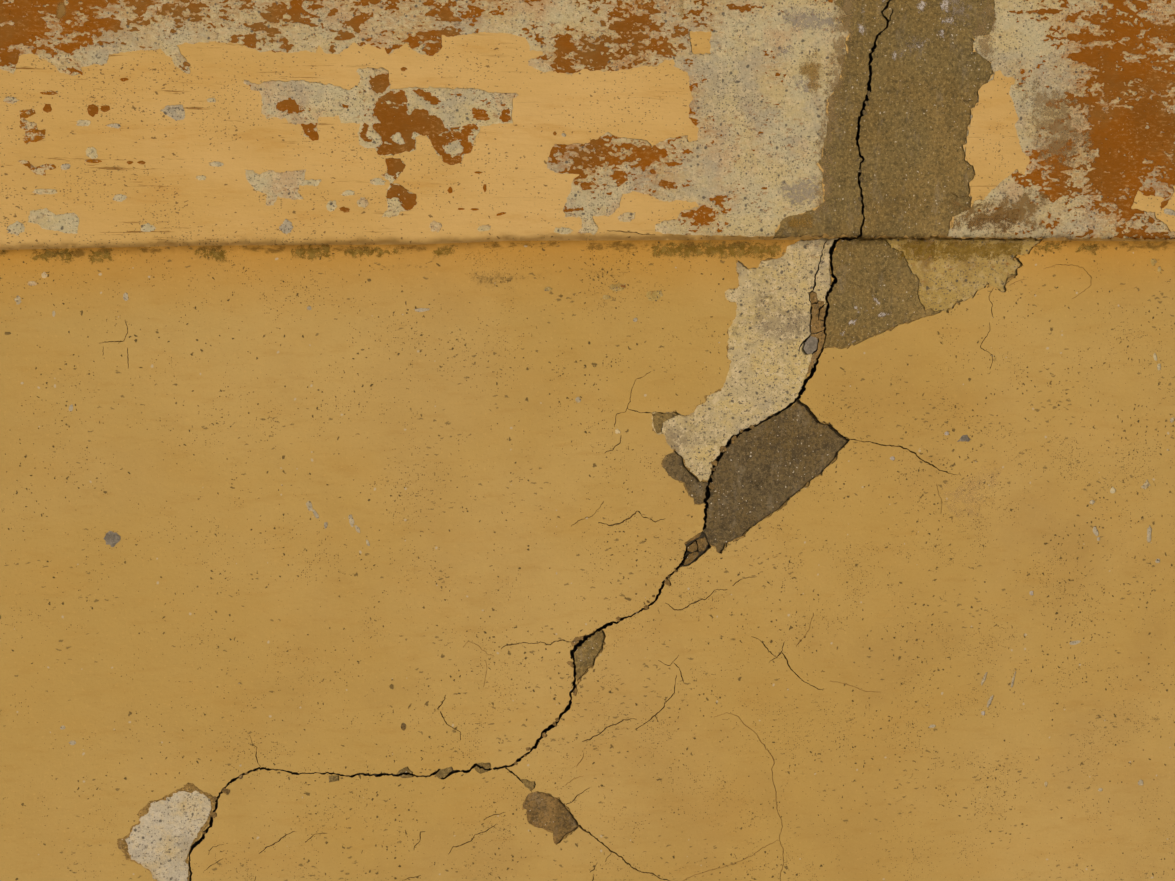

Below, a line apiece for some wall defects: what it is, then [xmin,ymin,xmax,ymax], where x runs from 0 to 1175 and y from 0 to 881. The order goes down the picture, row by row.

peeling [0,0,849,237]
peeling [652,0,1175,567]
crack [189,0,893,881]
crack [841,435,956,507]
flaking render [117,783,215,881]
flaking render [521,779,578,844]